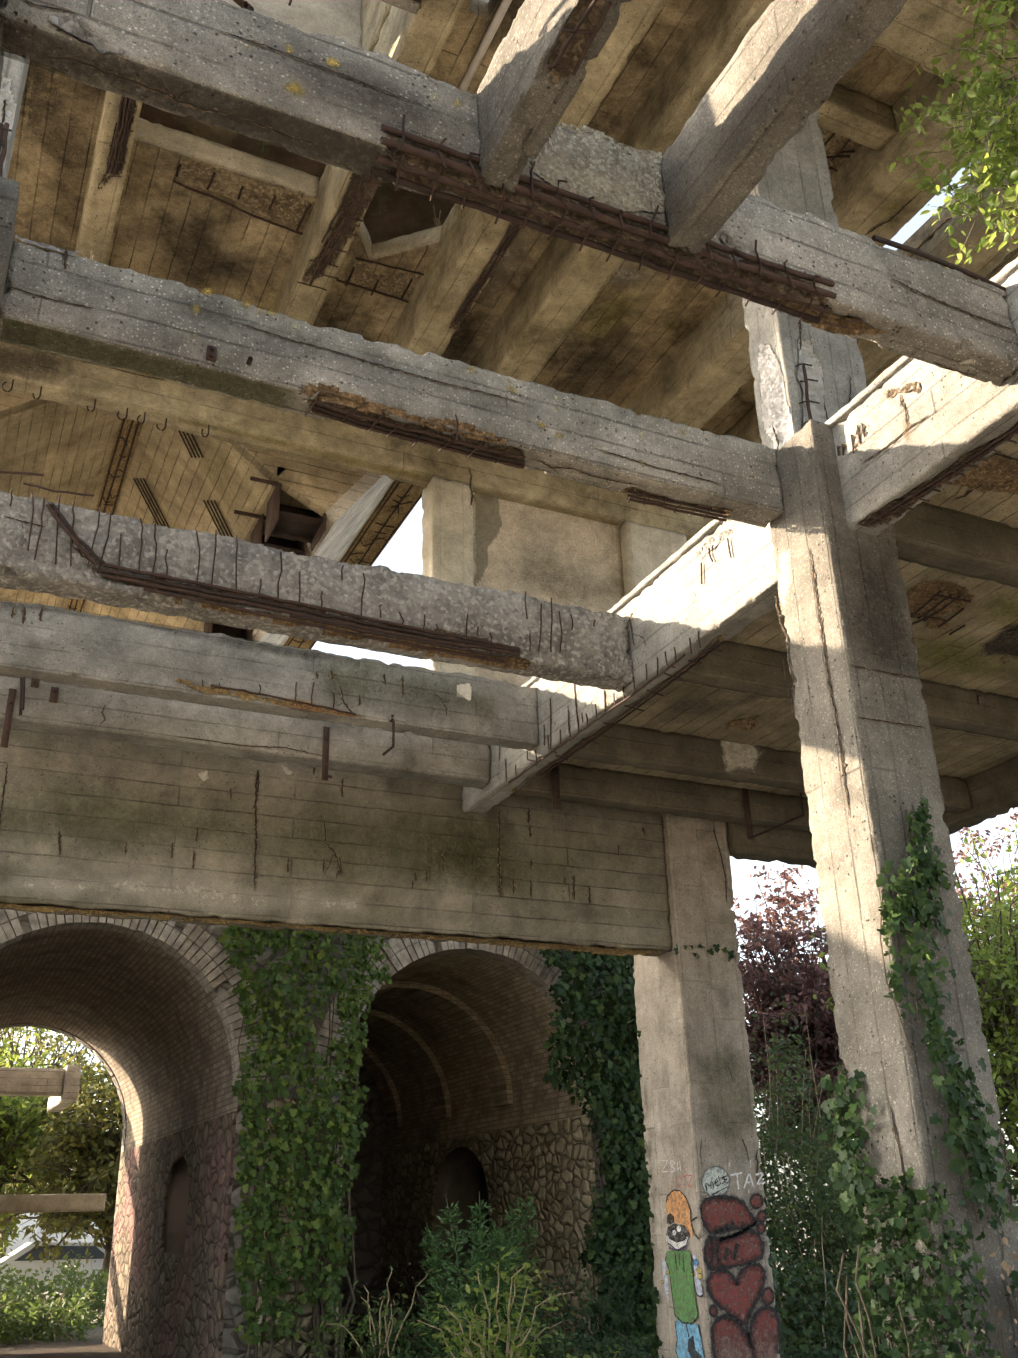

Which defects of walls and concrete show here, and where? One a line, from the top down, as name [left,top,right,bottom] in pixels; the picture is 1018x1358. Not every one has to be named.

spalling [546,0,612,85]
spalling [297,114,887,449]
spalling [301,383,525,469]
spalling [858,422,1018,528]
spalling [0,418,573,671]
spalling [906,580,975,635]
damp [986,624,1018,657]
spalling [175,678,356,717]